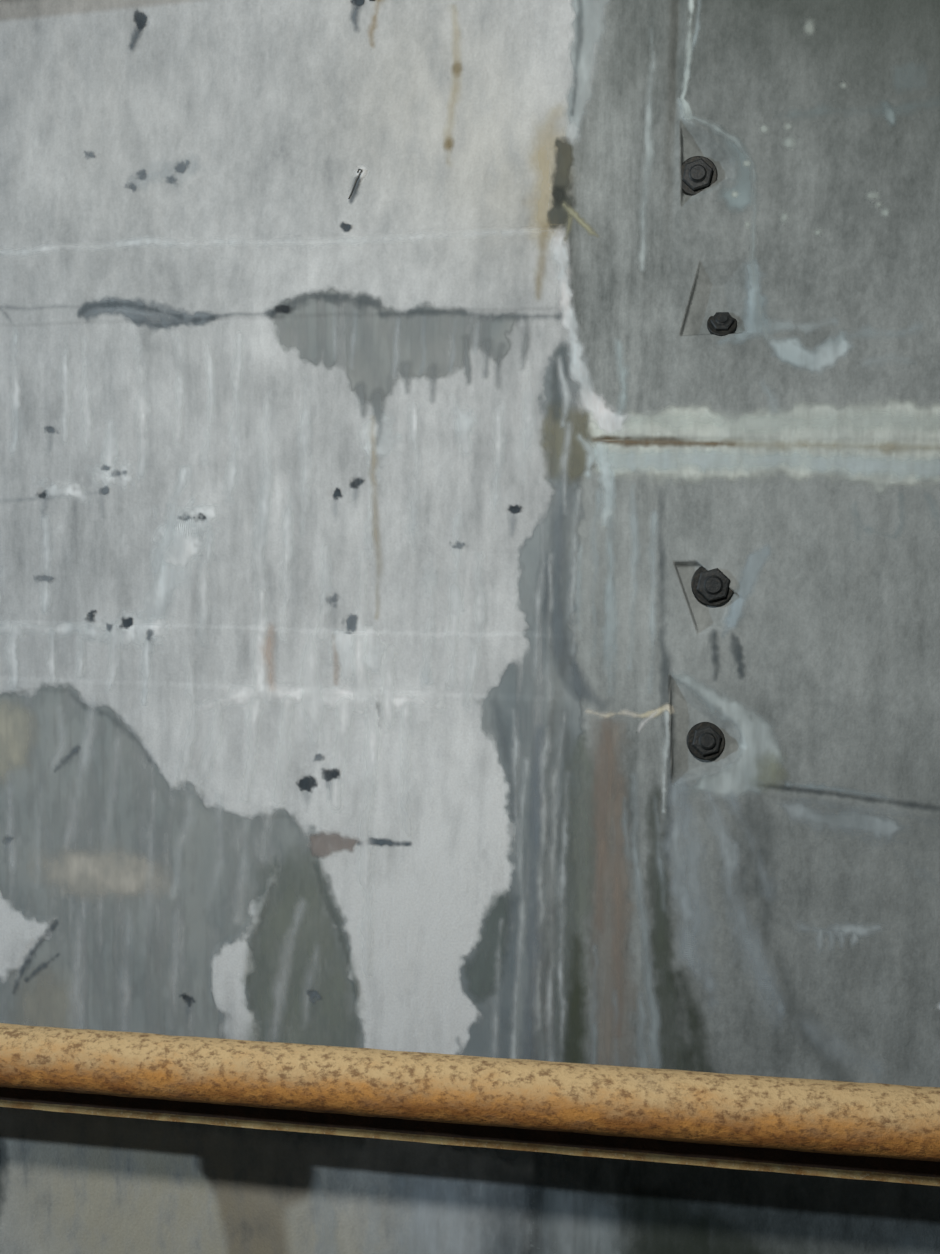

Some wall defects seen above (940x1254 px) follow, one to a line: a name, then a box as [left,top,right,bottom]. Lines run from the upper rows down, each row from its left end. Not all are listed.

damp [79,298,214,328]
damp [269,289,528,458]
damp [96,397,147,486]
damp [47,483,85,500]
spalling [298,754,339,791]